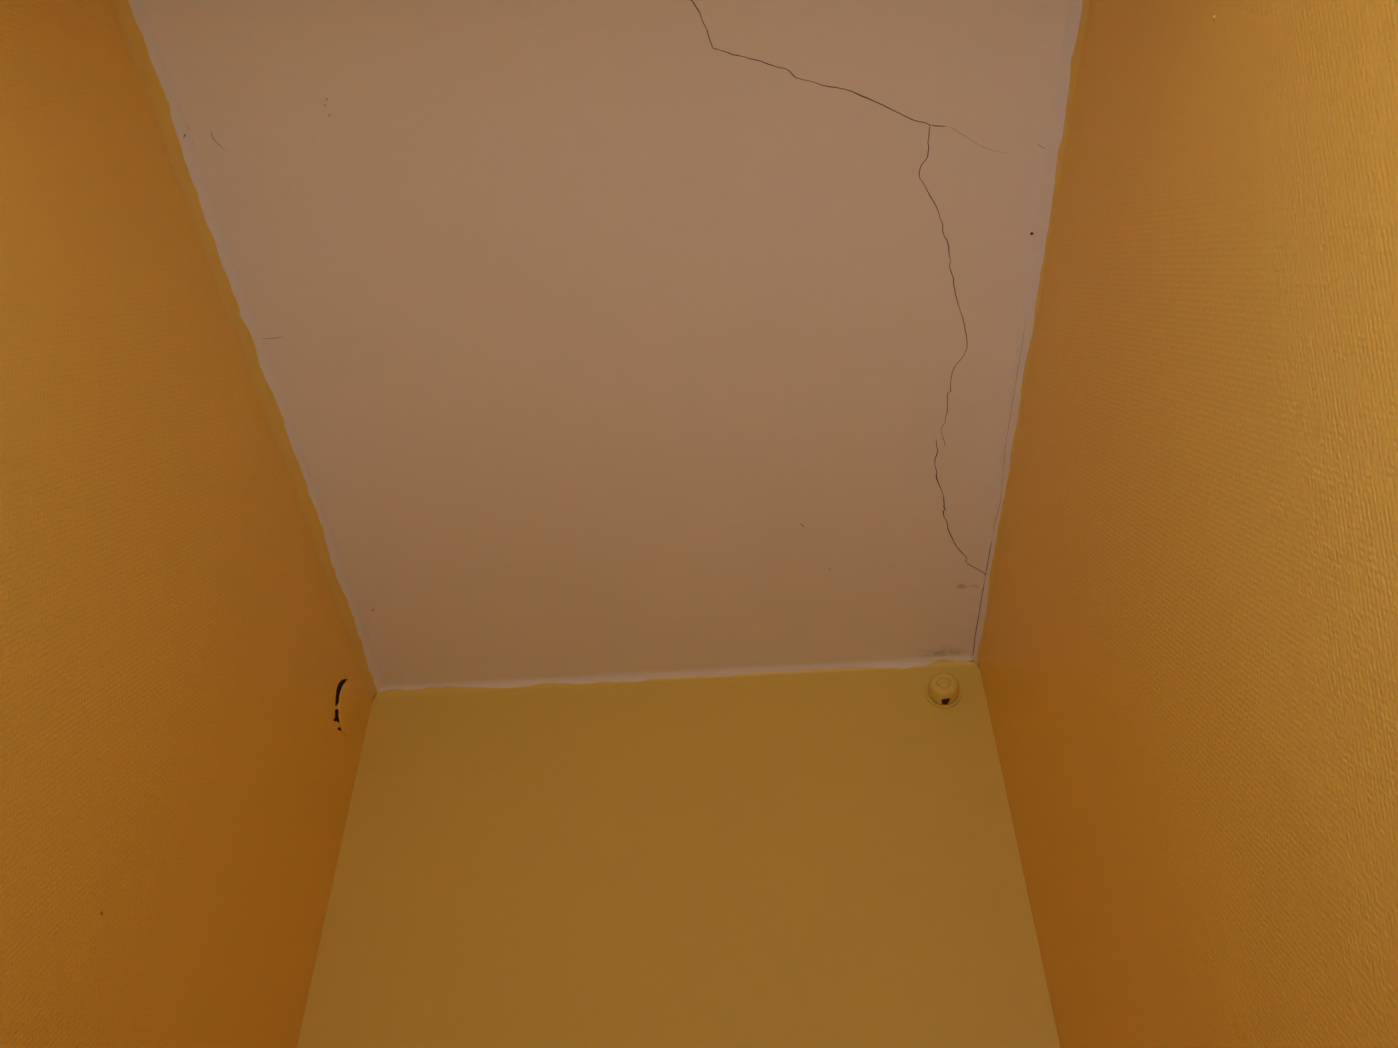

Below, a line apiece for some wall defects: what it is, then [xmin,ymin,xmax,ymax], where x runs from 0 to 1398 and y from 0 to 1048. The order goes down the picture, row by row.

crack [691,0,1045,662]